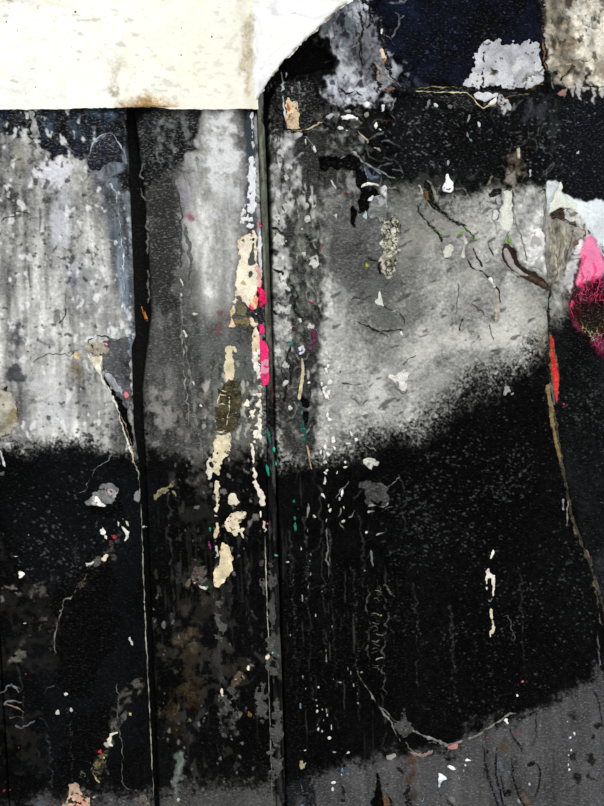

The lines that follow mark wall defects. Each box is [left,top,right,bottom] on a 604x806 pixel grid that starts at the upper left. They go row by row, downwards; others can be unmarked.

peeling [463,38,544,90]
corrosion [121,98,176,108]
peeling [224,346,237,382]
peeling [62,771,96,806]